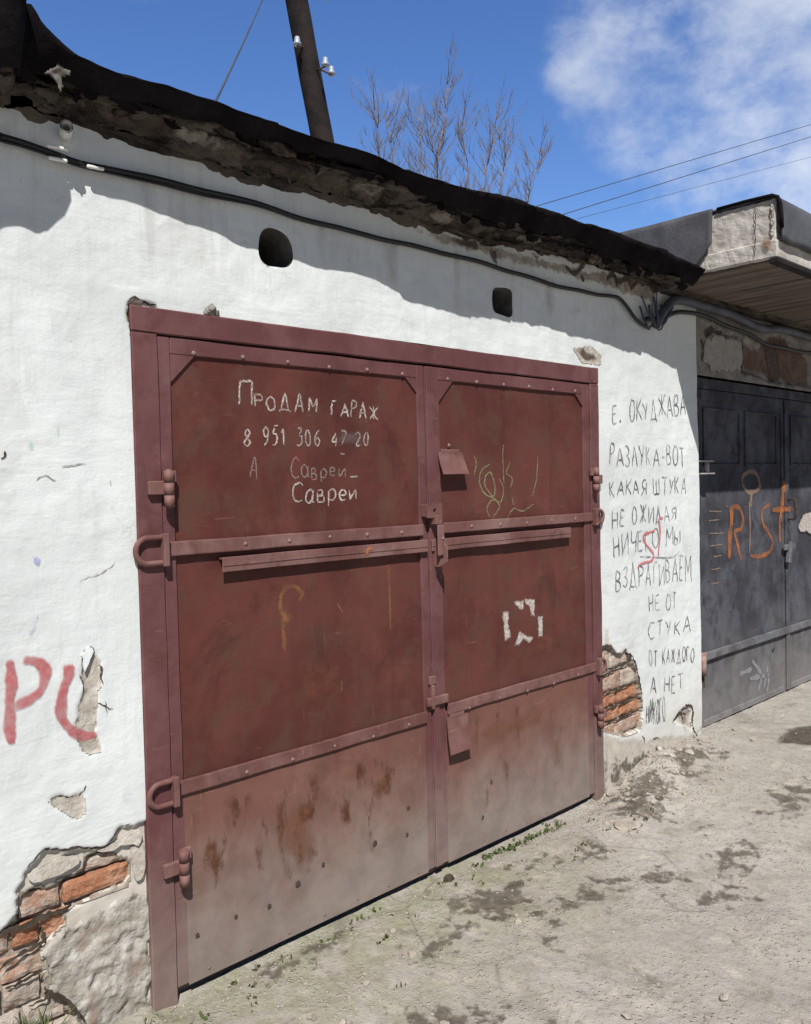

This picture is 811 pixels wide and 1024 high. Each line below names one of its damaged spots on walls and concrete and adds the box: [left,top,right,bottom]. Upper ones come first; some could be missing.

spalling [175,126,221,149]
flaking render [573,346,602,365]
flaking render [701,326,743,375]
flaking render [76,646,103,755]
flaking render [602,645,643,737]
flaking render [673,704,698,736]
flaking render [48,786,86,819]
flaking render [0,829,151,1024]